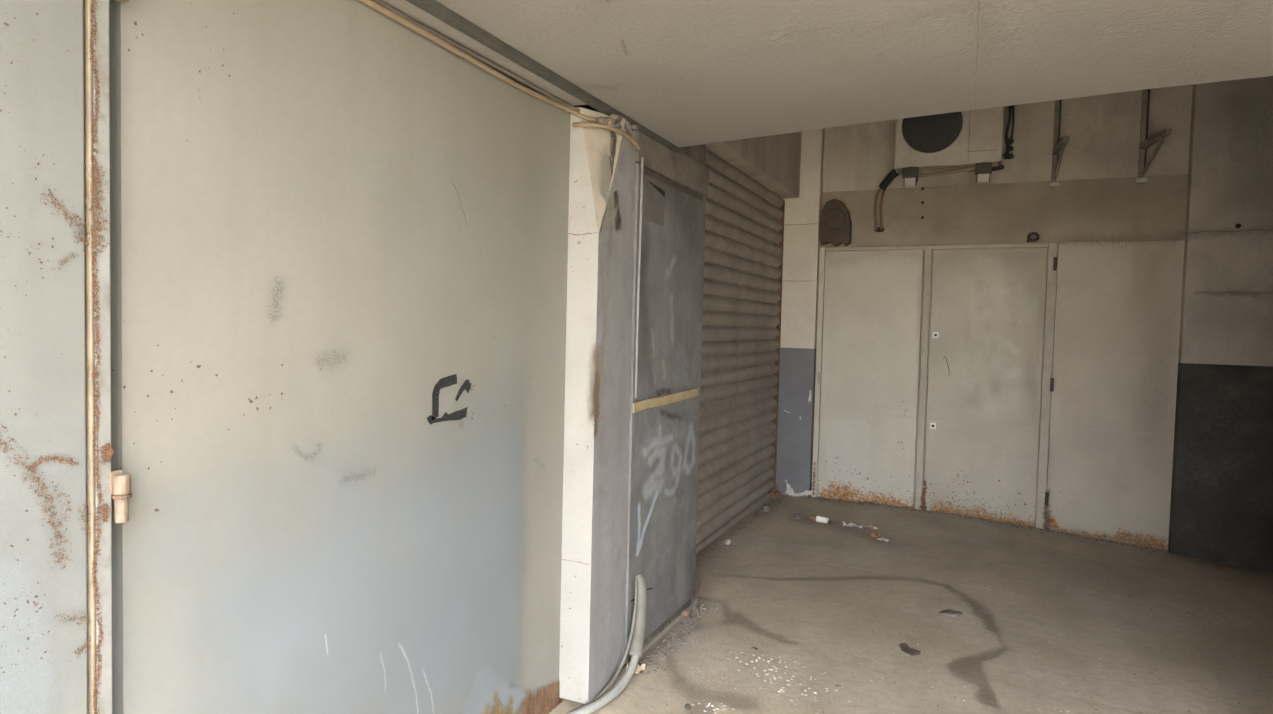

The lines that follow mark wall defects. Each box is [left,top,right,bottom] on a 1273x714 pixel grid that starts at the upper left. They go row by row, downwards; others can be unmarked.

corrosion [812,456,1168,550]
water stain [719,573,1012,708]